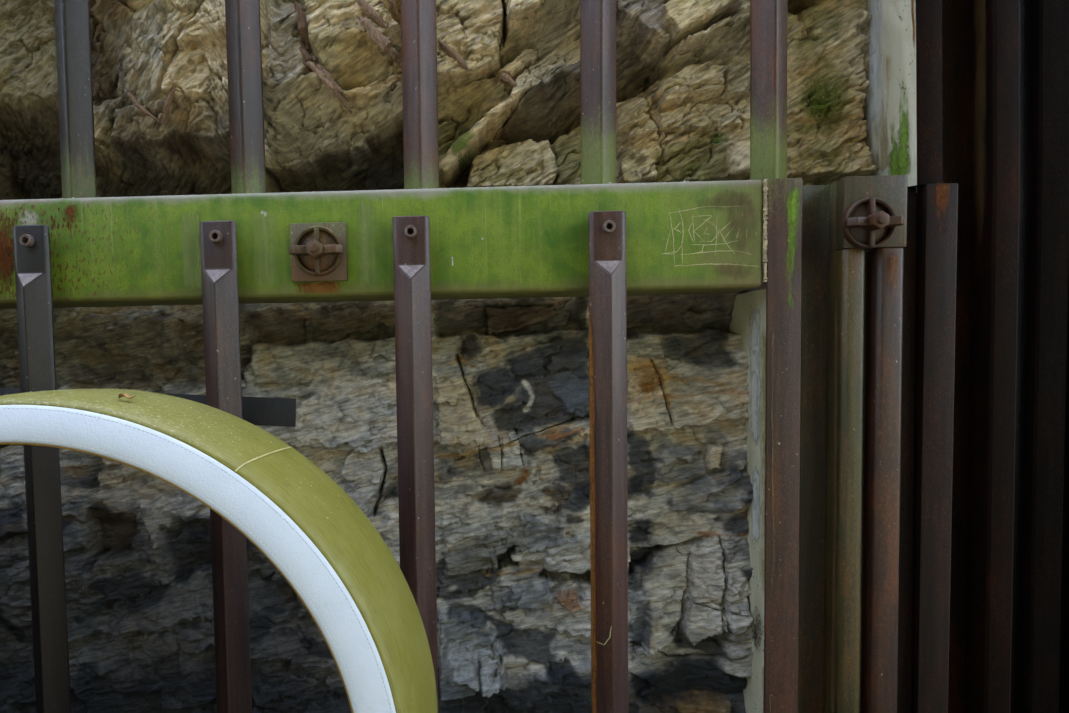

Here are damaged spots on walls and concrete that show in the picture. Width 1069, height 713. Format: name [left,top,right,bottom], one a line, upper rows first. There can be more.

rust [975,0,986,230]
rust [0,217,14,294]